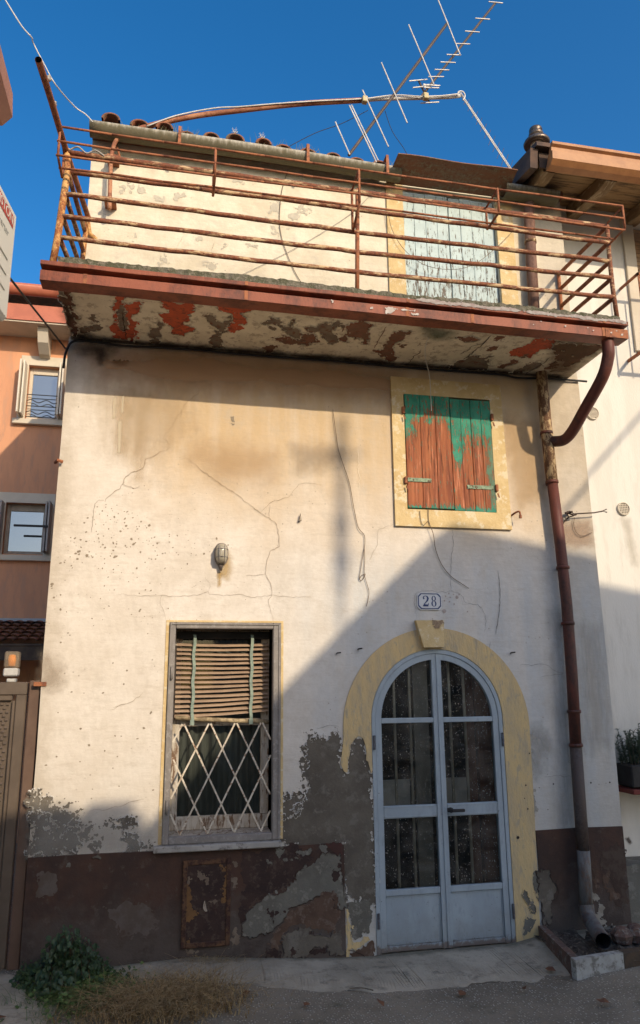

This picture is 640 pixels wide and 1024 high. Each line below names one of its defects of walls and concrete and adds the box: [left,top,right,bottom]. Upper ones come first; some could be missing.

spalling [57,291,412,362]
peeling [370,298,627,336]
peeling [447,335,602,373]
crack [91,447,315,614]
flaking render [23,787,155,898]
flaking render [228,729,382,958]
peeling [186,861,238,922]
flaking render [521,868,557,936]